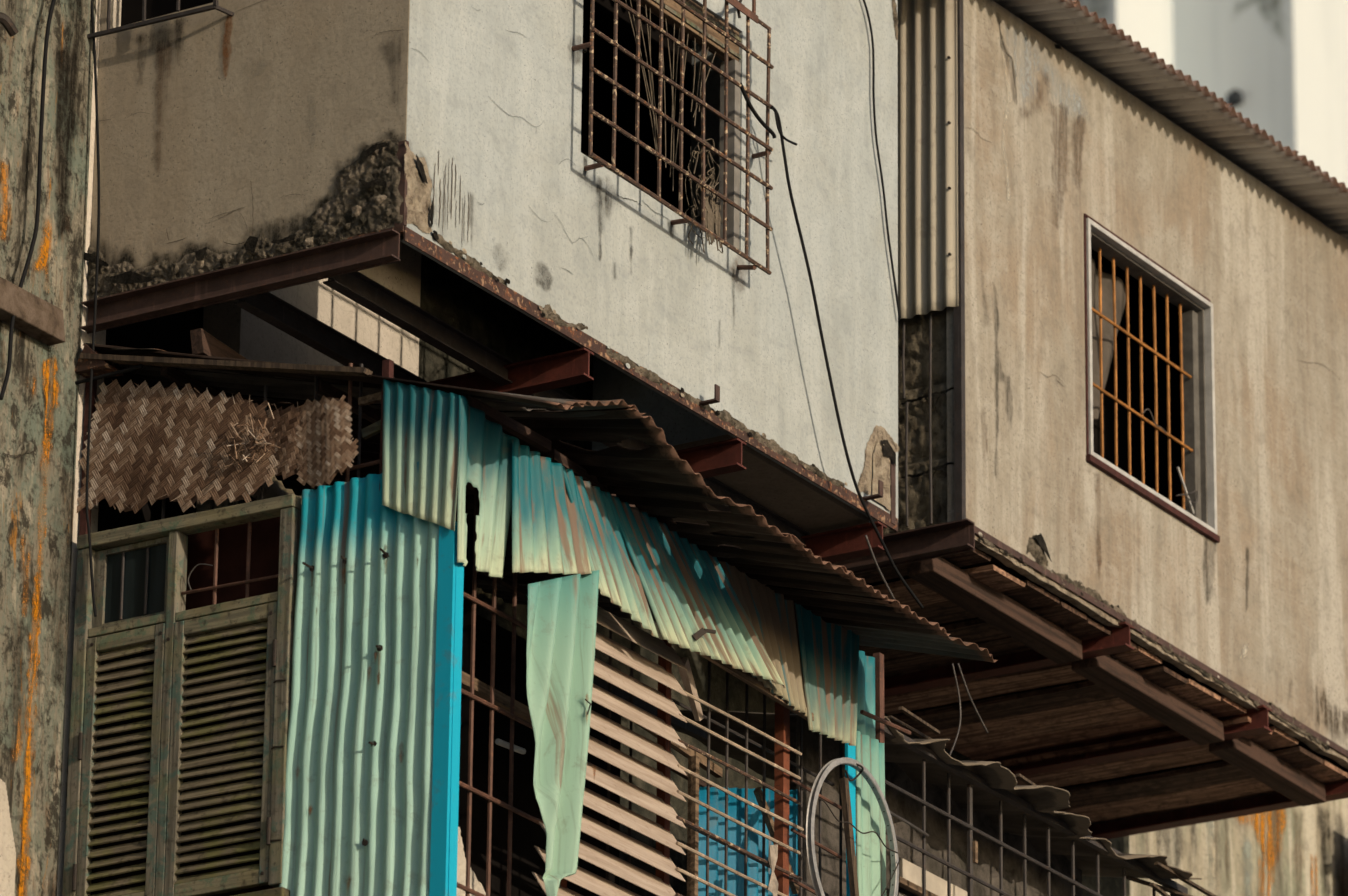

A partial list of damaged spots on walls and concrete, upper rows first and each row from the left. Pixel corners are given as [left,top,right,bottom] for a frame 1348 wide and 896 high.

rust [223,16,232,76]
flaking render [84,138,510,300]